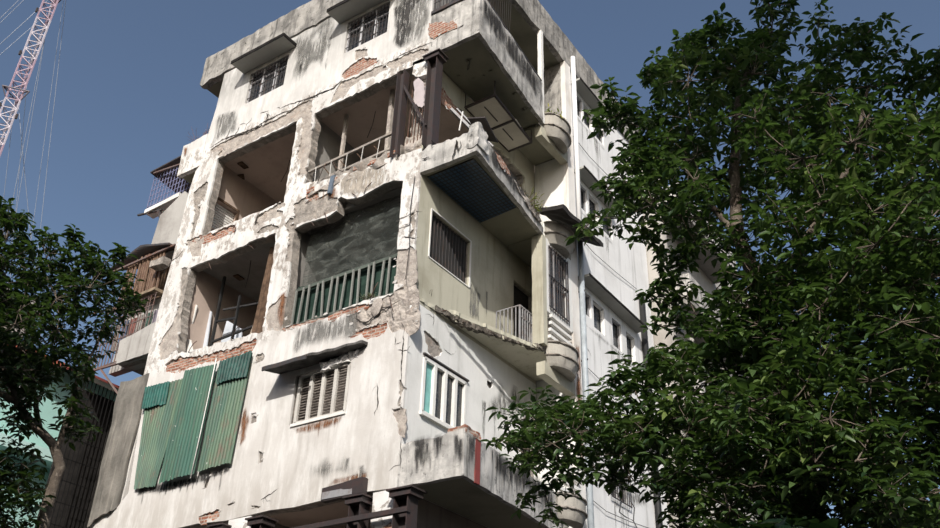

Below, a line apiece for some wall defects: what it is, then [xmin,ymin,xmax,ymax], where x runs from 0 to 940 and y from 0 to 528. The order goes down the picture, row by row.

leakage [395,0,428,46]
spalling [332,47,428,102]
spalling [211,101,343,263]
peeling [185,182,235,270]
spalling [264,211,442,359]
flaking render [159,267,265,373]
crack [350,302,410,379]
spalling [435,305,544,352]
corrosion [240,412,249,444]
spalling [393,380,407,438]
leakage [414,436,441,469]
leakage [492,450,557,504]